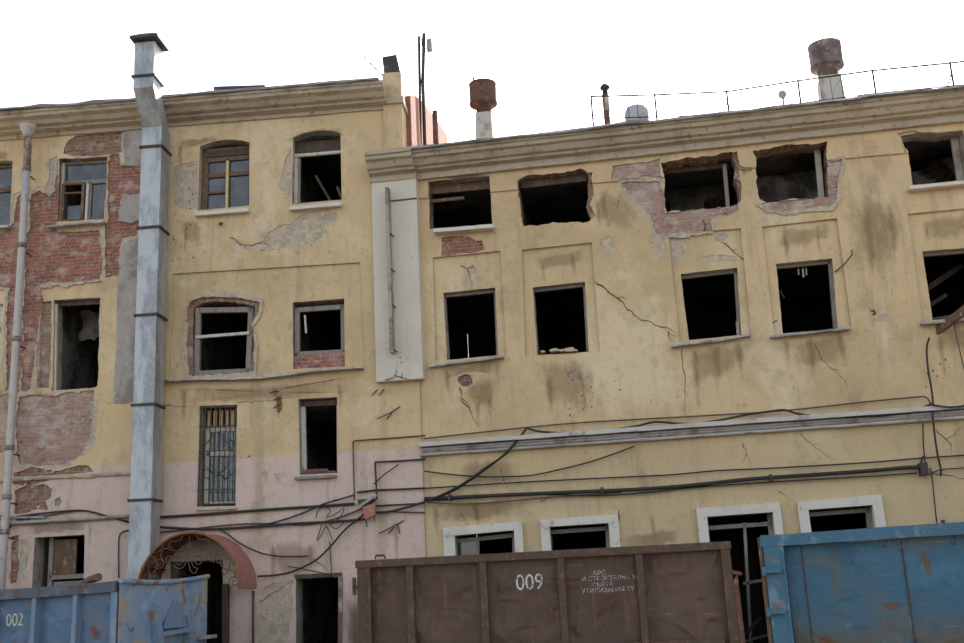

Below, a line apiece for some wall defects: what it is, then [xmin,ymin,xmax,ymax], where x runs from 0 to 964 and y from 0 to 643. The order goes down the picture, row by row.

flaking render [233,209,338,254]
flaking render [441,235,484,283]
flaking render [611,153,752,263]
flaking render [757,156,845,215]
flaking render [0,131,141,521]
crack [594,281,687,418]
flaking render [8,535,20,584]